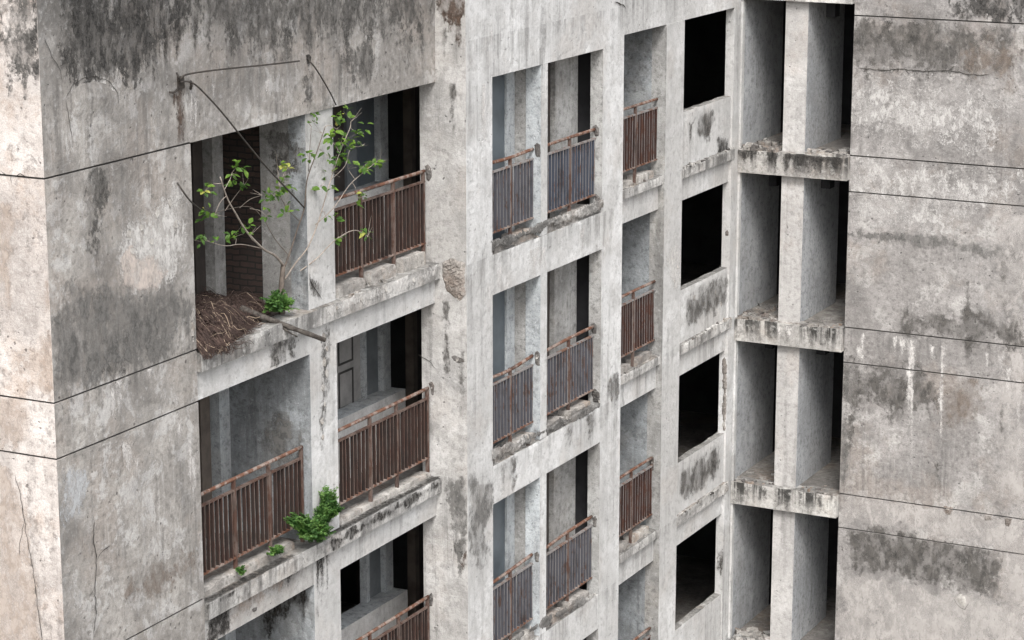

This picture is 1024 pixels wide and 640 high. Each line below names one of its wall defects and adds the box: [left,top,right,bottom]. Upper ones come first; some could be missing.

damp [58,0,431,93]
rust [436,0,465,46]
crack [860,66,990,76]
damp [689,111,714,138]
spalling [492,194,604,252]
spalling [326,258,466,317]
damp [840,297,1024,480]
damp [680,448,720,499]
crack [15,476,42,637]
crack [91,521,108,634]
damp [849,525,1003,594]